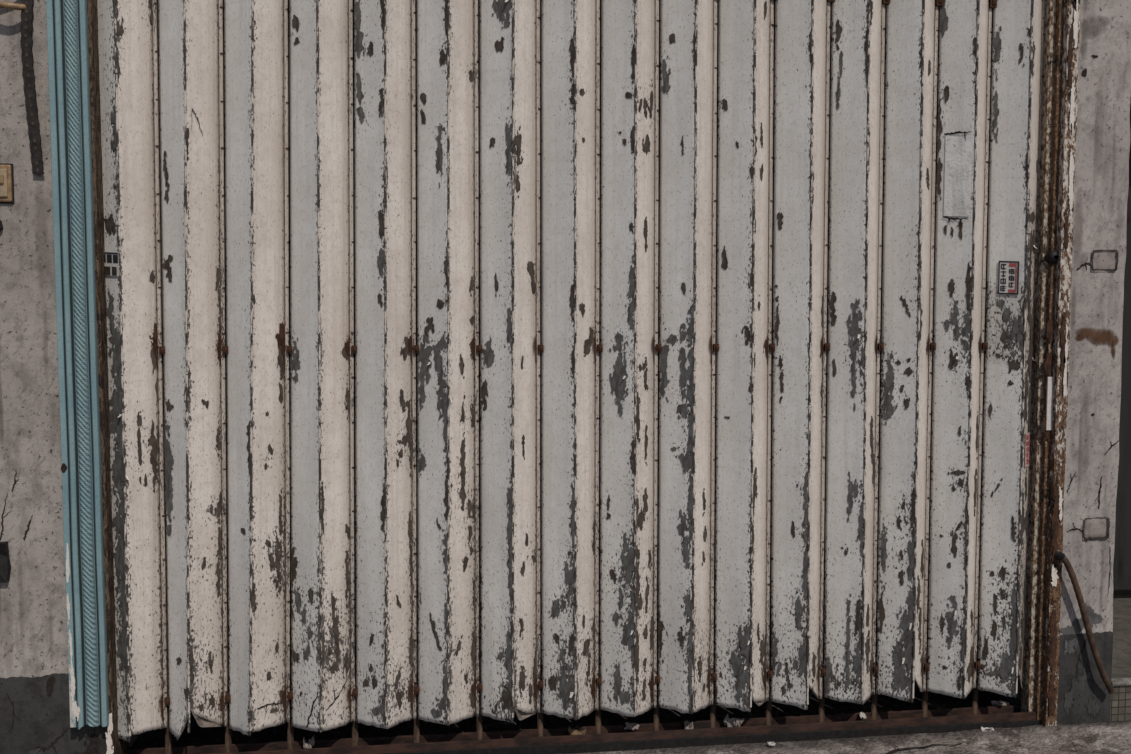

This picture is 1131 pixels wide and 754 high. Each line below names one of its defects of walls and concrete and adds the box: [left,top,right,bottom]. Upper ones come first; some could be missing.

crack [0,470,33,540]
peeling [265,489,350,674]
peeling [396,299,495,613]
peeling [494,466,595,718]
peeling [610,487,664,706]
peeling [609,216,707,569]
peeling [730,472,924,709]
peeling [821,291,913,487]
rust [1042,411,1051,442]
rust [1052,472,1061,570]
rust [1044,311,1118,377]
crack [1067,440,1120,596]